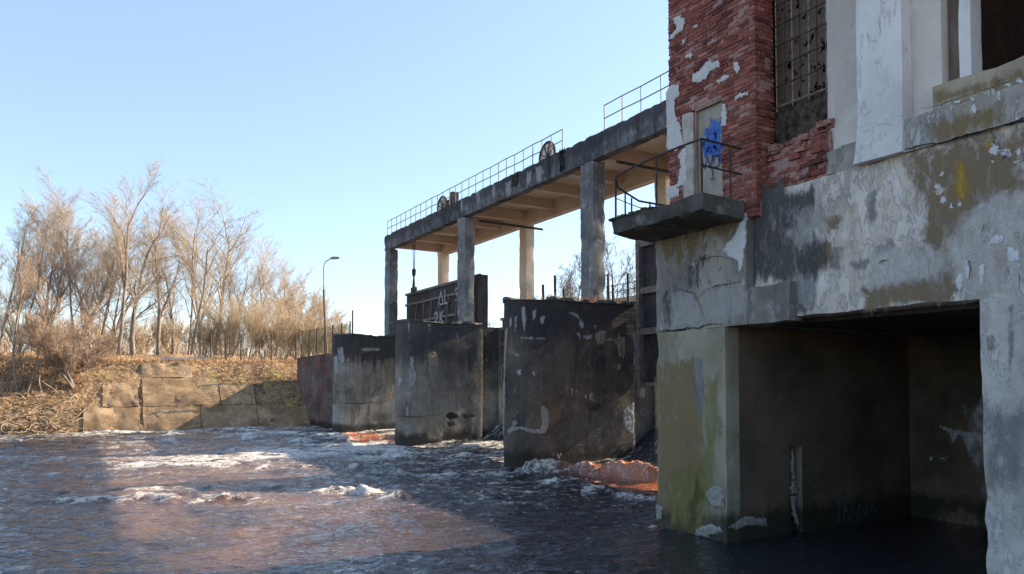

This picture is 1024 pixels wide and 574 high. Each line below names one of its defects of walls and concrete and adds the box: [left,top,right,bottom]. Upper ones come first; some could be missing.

peeling [665,84,687,198]
peeling [669,15,698,59]
peeling [692,60,740,85]
peeling [721,90,749,126]
damp [753,176,868,315]
peeling [868,193,1024,295]
crack [665,256,741,331]
damp [655,359,704,526]
spalling [705,486,725,509]
spalling [695,516,767,538]
spalling [790,448,799,529]